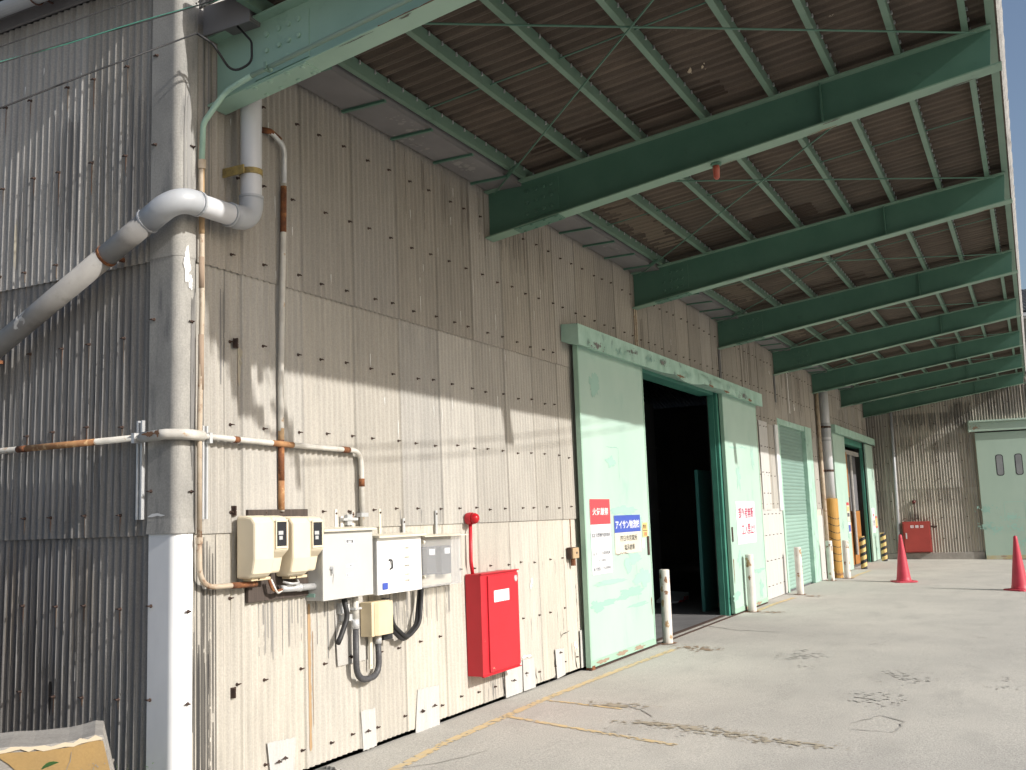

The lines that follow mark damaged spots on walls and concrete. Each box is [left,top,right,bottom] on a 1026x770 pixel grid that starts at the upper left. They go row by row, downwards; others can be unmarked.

damp [16,76,150,276]
rust [15,430,95,453]
rust [273,428,295,510]